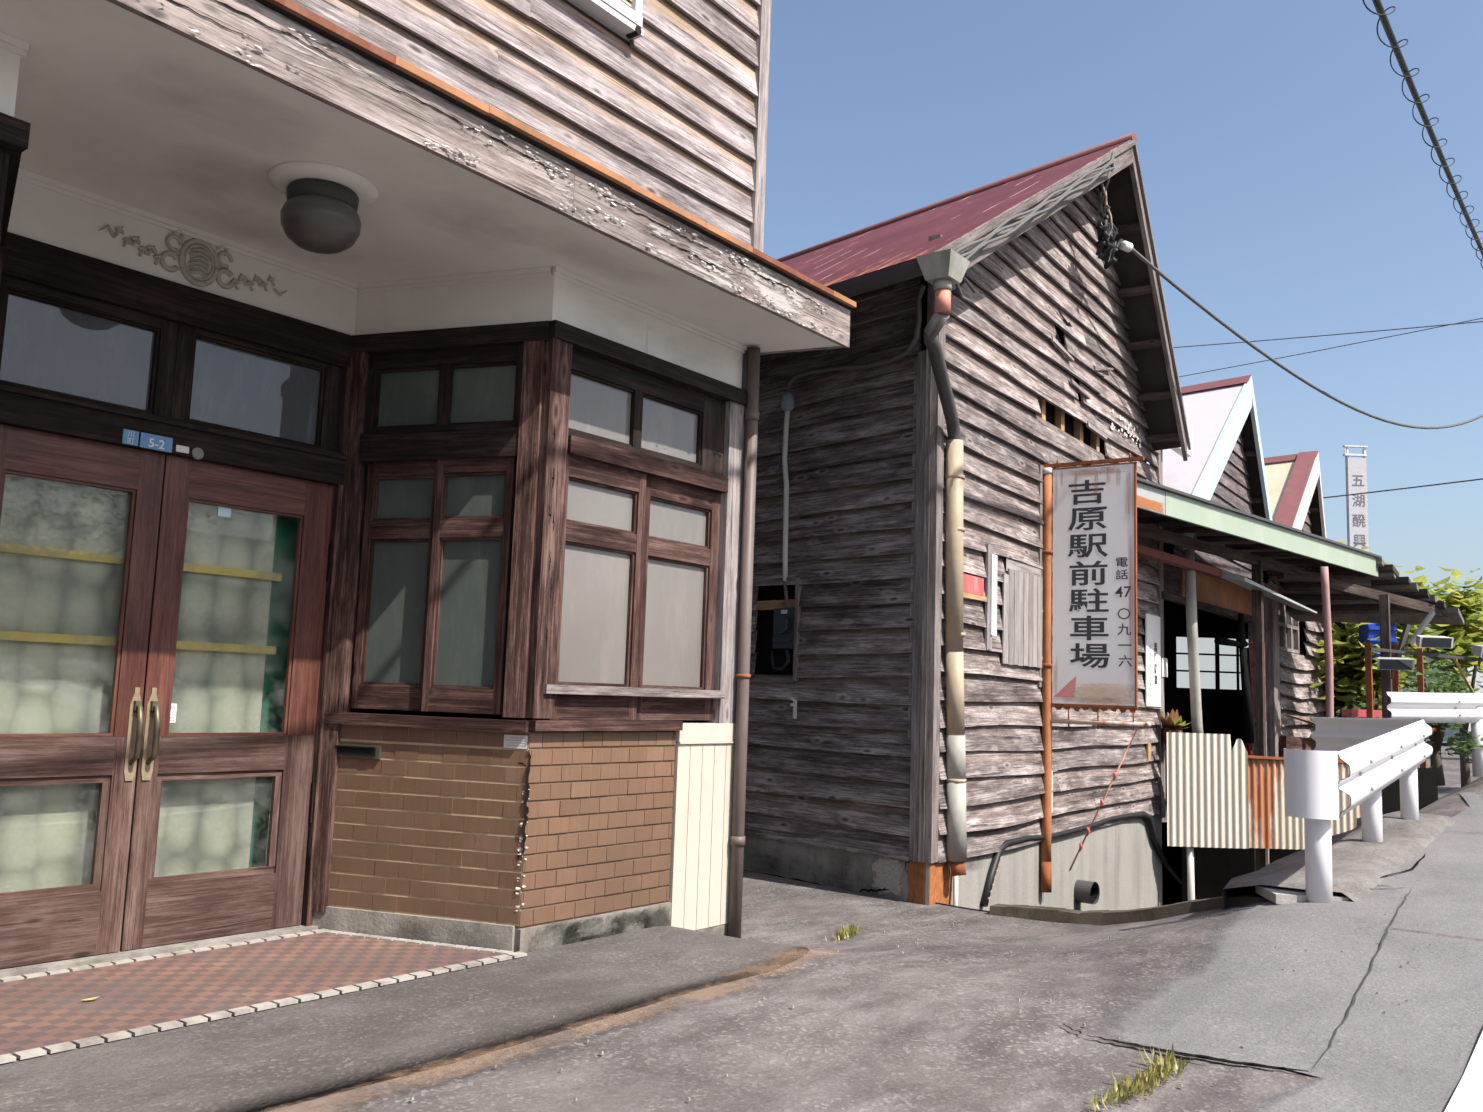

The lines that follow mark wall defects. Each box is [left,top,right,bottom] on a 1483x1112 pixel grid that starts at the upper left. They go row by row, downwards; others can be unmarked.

peeling [220,34,271,70]
peeling [423,125,662,257]
peeling [668,223,835,334]
crack [518,751,531,860]